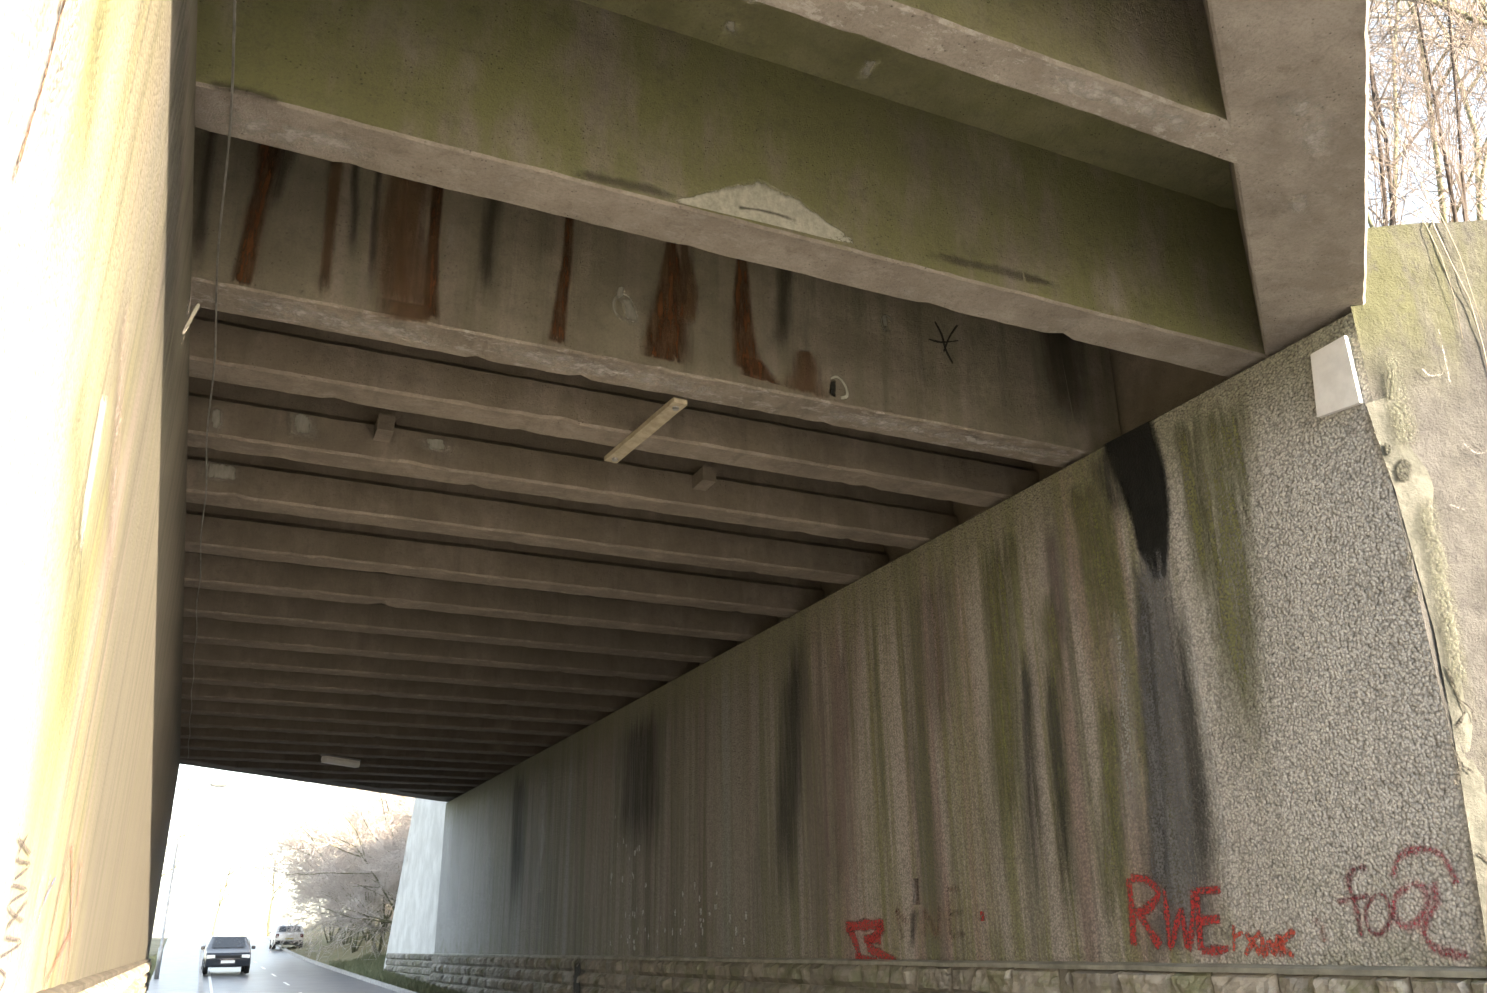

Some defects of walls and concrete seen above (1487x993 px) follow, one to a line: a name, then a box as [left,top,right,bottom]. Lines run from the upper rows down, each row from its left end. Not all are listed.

rust [233,143,293,285]
rust [320,161,342,286]
rust [371,172,443,323]
rust [550,217,574,343]
rust [645,242,697,362]
rust [734,259,818,396]
water stain [1097,421,1210,947]